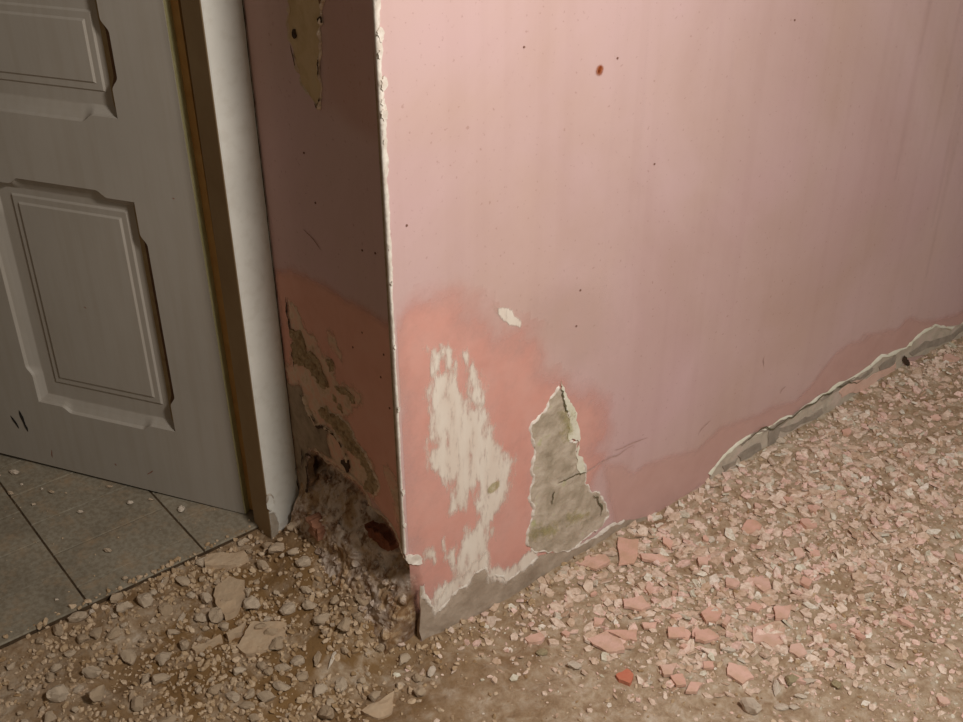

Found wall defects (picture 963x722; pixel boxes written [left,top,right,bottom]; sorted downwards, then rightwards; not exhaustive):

spalling [0,0,660,722]
damp [277,272,563,603]
damp [565,313,963,522]
flaking render [708,322,963,480]